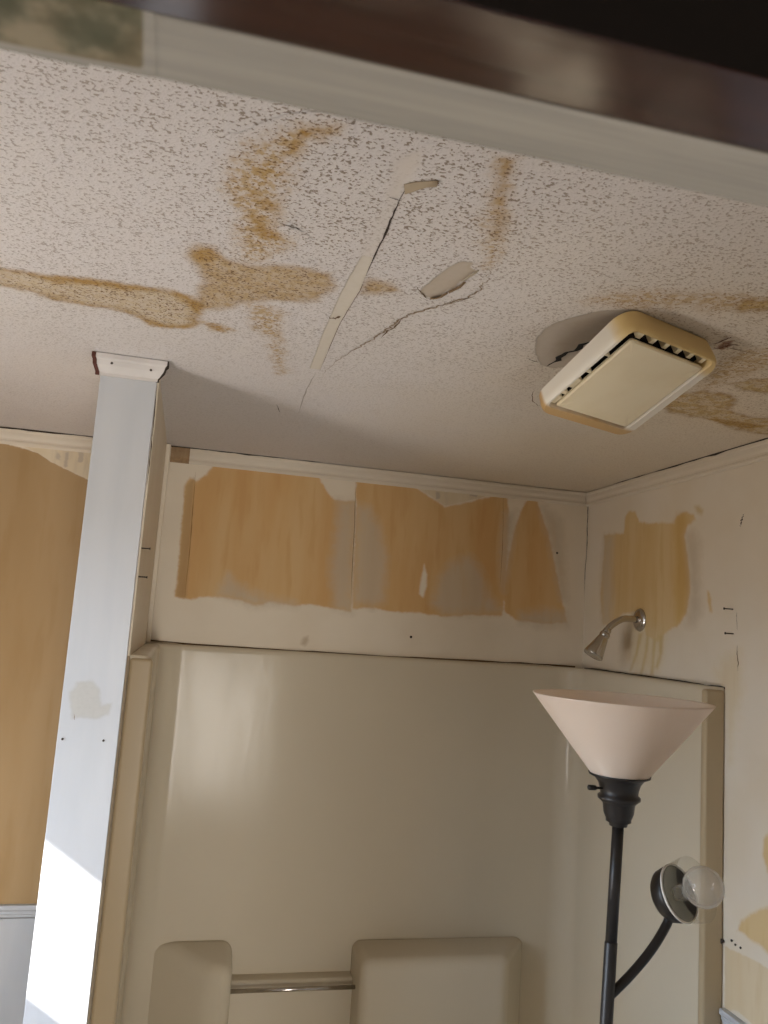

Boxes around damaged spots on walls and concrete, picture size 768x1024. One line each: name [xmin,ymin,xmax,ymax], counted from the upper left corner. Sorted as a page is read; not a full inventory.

water stain [0,111,355,378]
water stain [361,275,407,299]
crack [325,270,491,372]
peeling [414,259,481,300]
water stain [467,147,531,275]
peeling [522,303,665,372]
water stain [658,342,768,438]